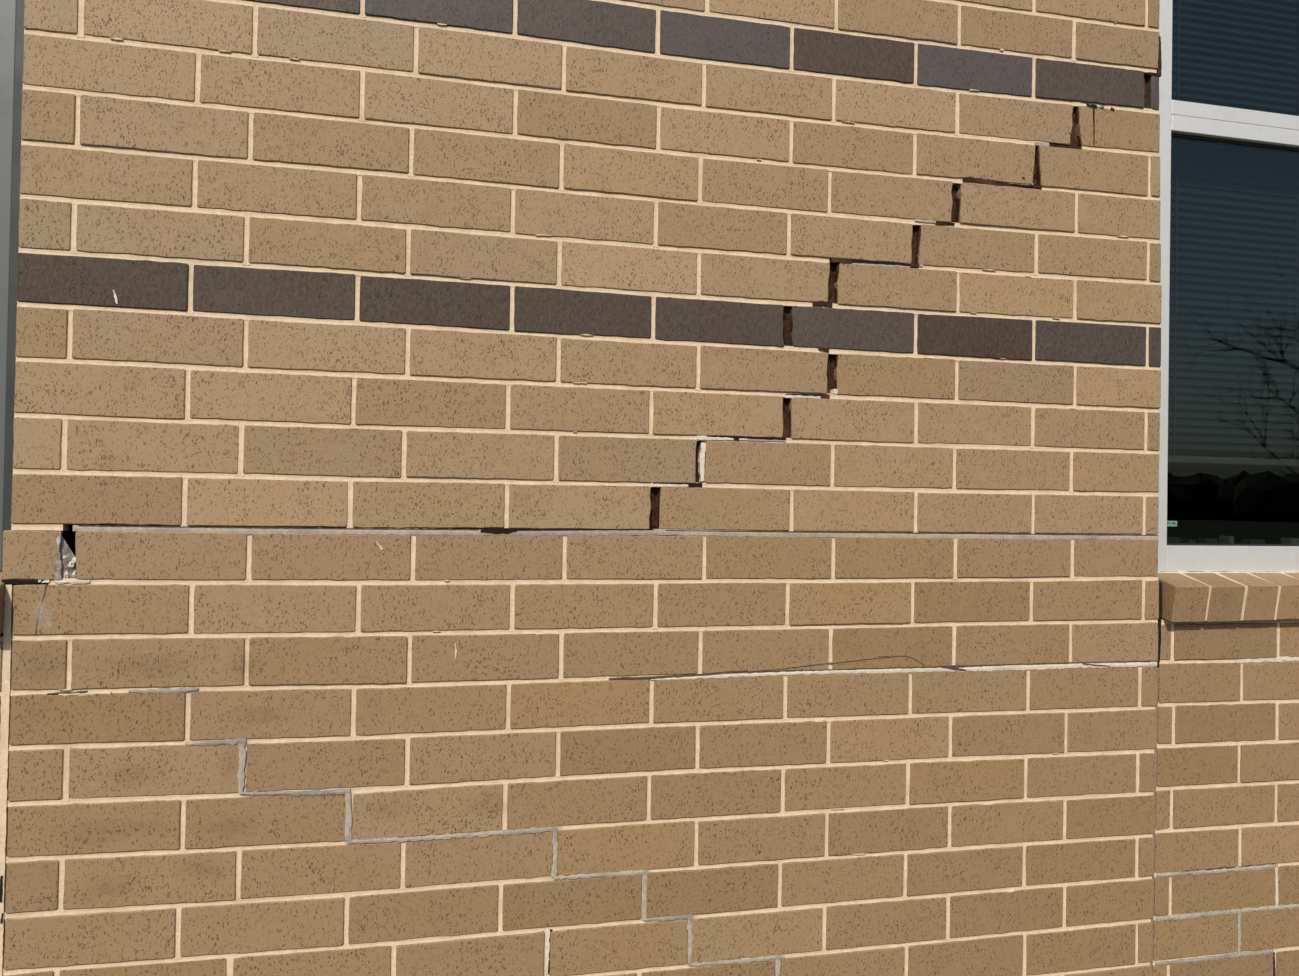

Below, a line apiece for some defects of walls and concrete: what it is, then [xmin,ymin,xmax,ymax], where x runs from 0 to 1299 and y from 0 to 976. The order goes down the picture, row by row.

crack [80,36,1162,536]
crack [609,582,1162,681]
crack [1185,863,1278,872]
crack [544,929,552,974]